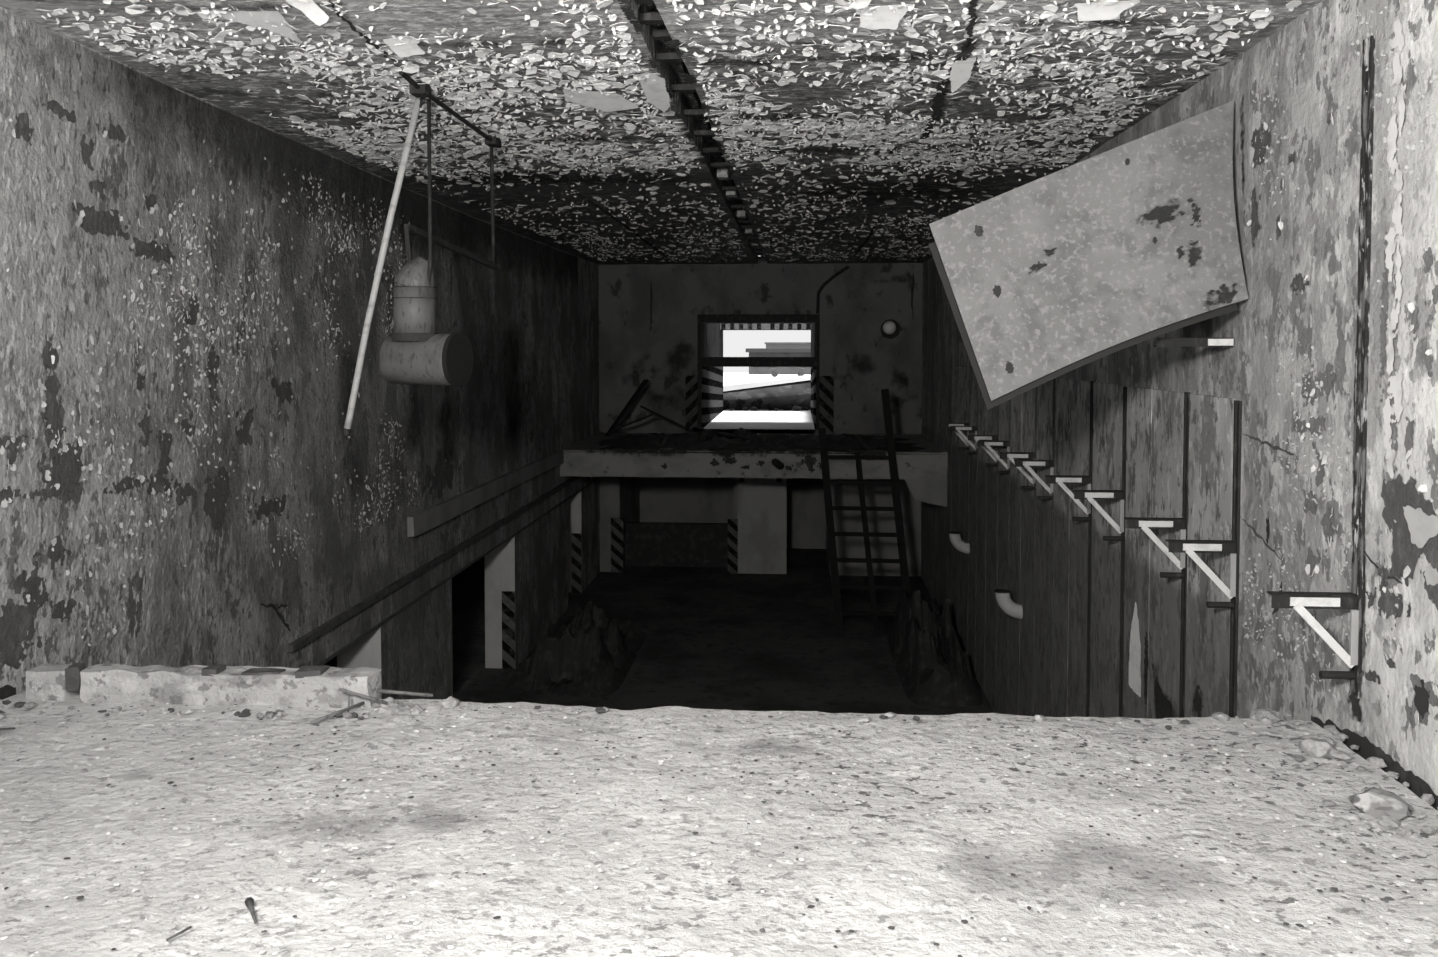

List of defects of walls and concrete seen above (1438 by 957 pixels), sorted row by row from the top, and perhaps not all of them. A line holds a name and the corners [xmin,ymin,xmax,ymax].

crack [920,0,978,139]
peeling [11,100,176,265]
peeling [0,334,85,508]
peeling [103,364,230,531]
peeling [183,293,221,400]
peeling [235,407,254,446]
peeling [252,494,289,526]
peeling [271,377,294,404]
peeling [1290,273,1309,296]
peeling [1293,363,1337,578]
peeling [1362,19,1438,732]
peeling [0,535,76,701]